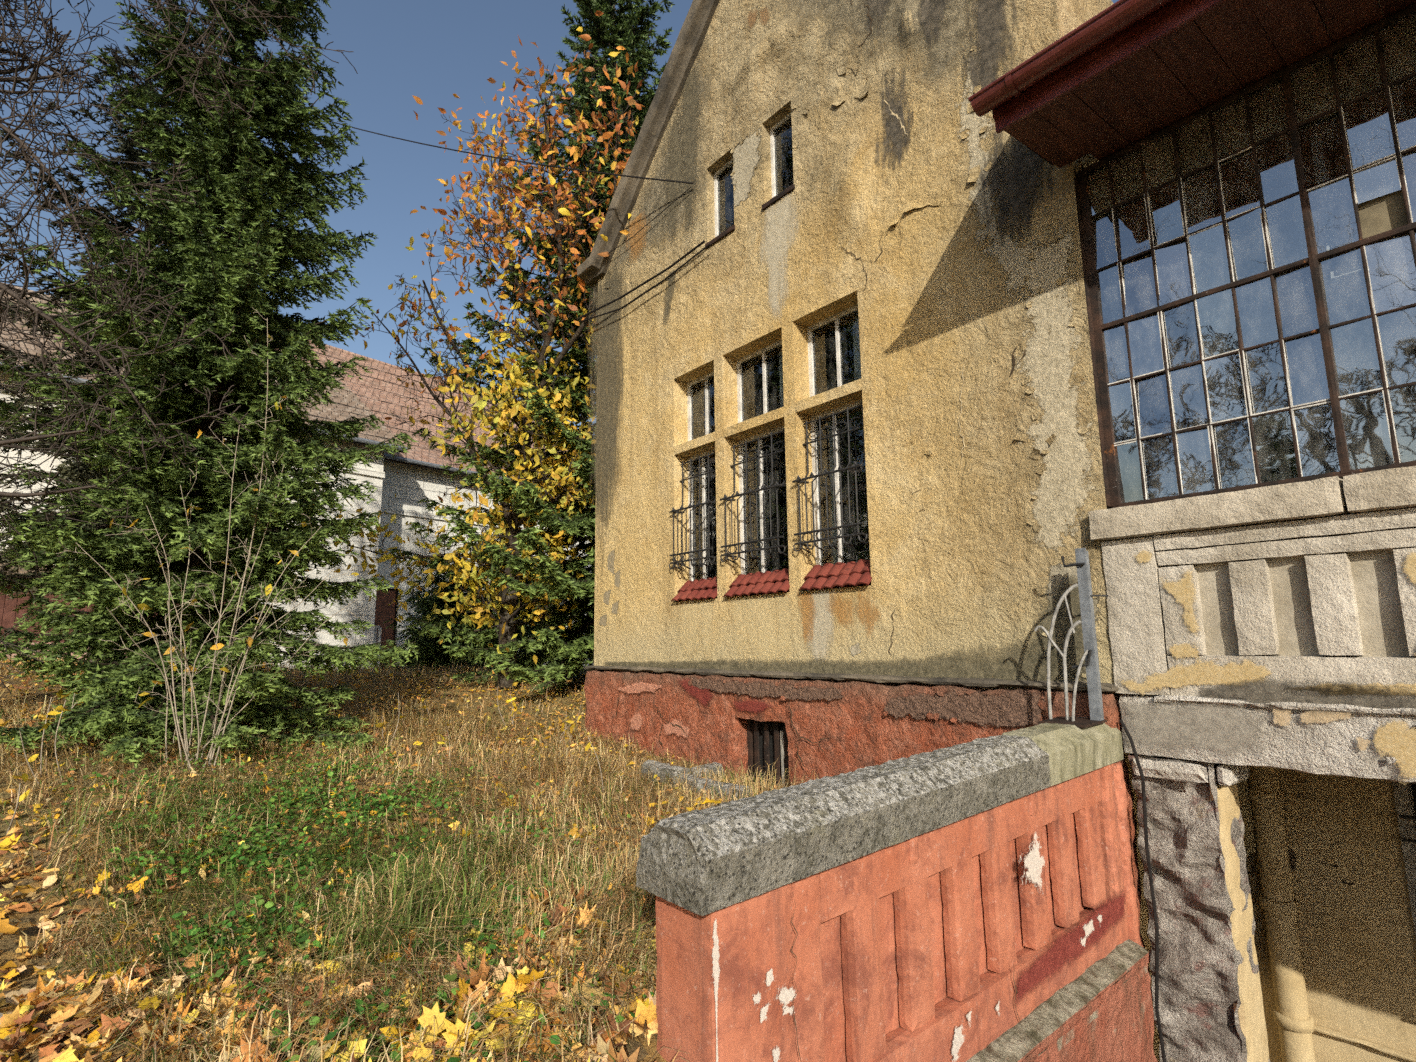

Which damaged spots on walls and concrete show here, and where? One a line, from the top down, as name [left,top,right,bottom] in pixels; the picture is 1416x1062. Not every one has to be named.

damp [918,0,948,45]
damp [963,0,1015,89]
damp [875,75,914,164]
damp [980,132,1052,243]
crack [836,220,903,294]
flaking render [790,0,1101,637]
damp [606,581,1086,706]
peeling [1121,571,1271,695]
flaking render [883,687,1048,728]
peeling [1356,721,1416,779]
peeling [1020,833,1045,894]
peeling [753,968,797,1023]